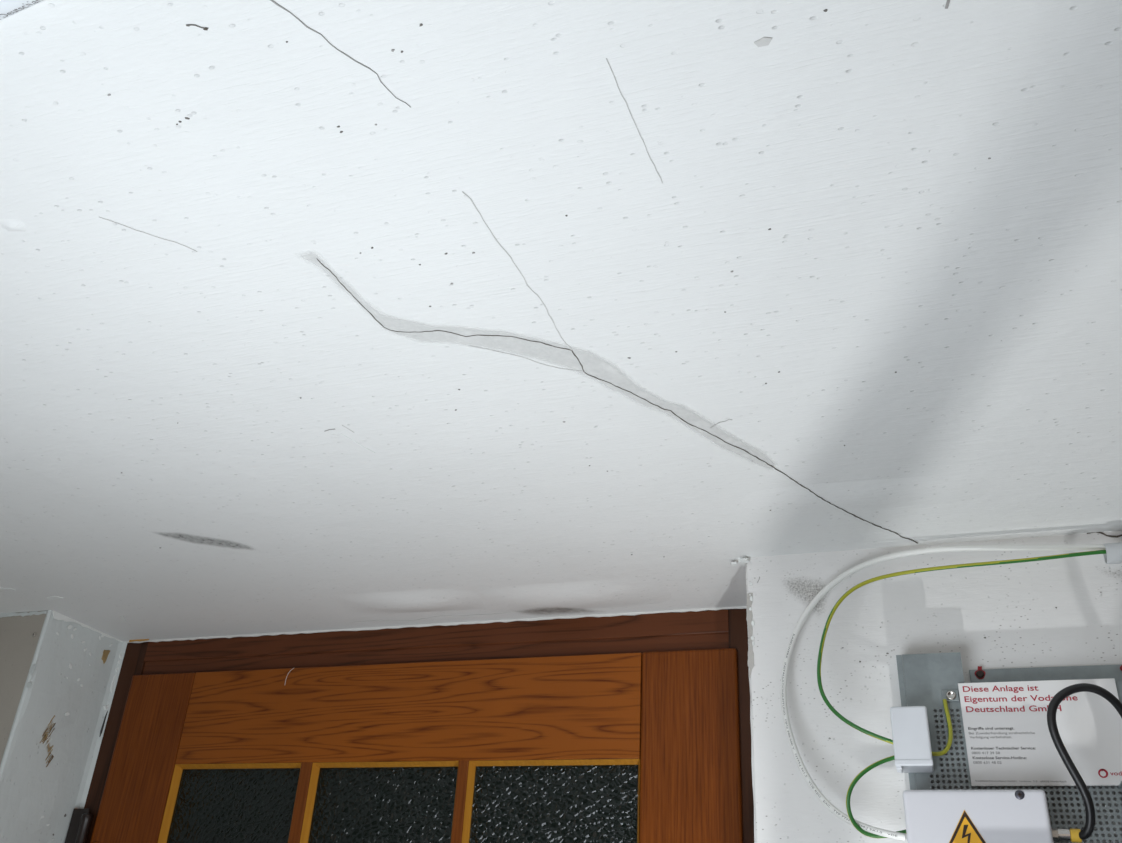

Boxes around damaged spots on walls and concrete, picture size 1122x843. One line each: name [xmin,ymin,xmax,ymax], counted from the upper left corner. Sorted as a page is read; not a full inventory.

crack [270,0,411,108]
crack [317,192,918,543]
spalling [40,712,70,767]